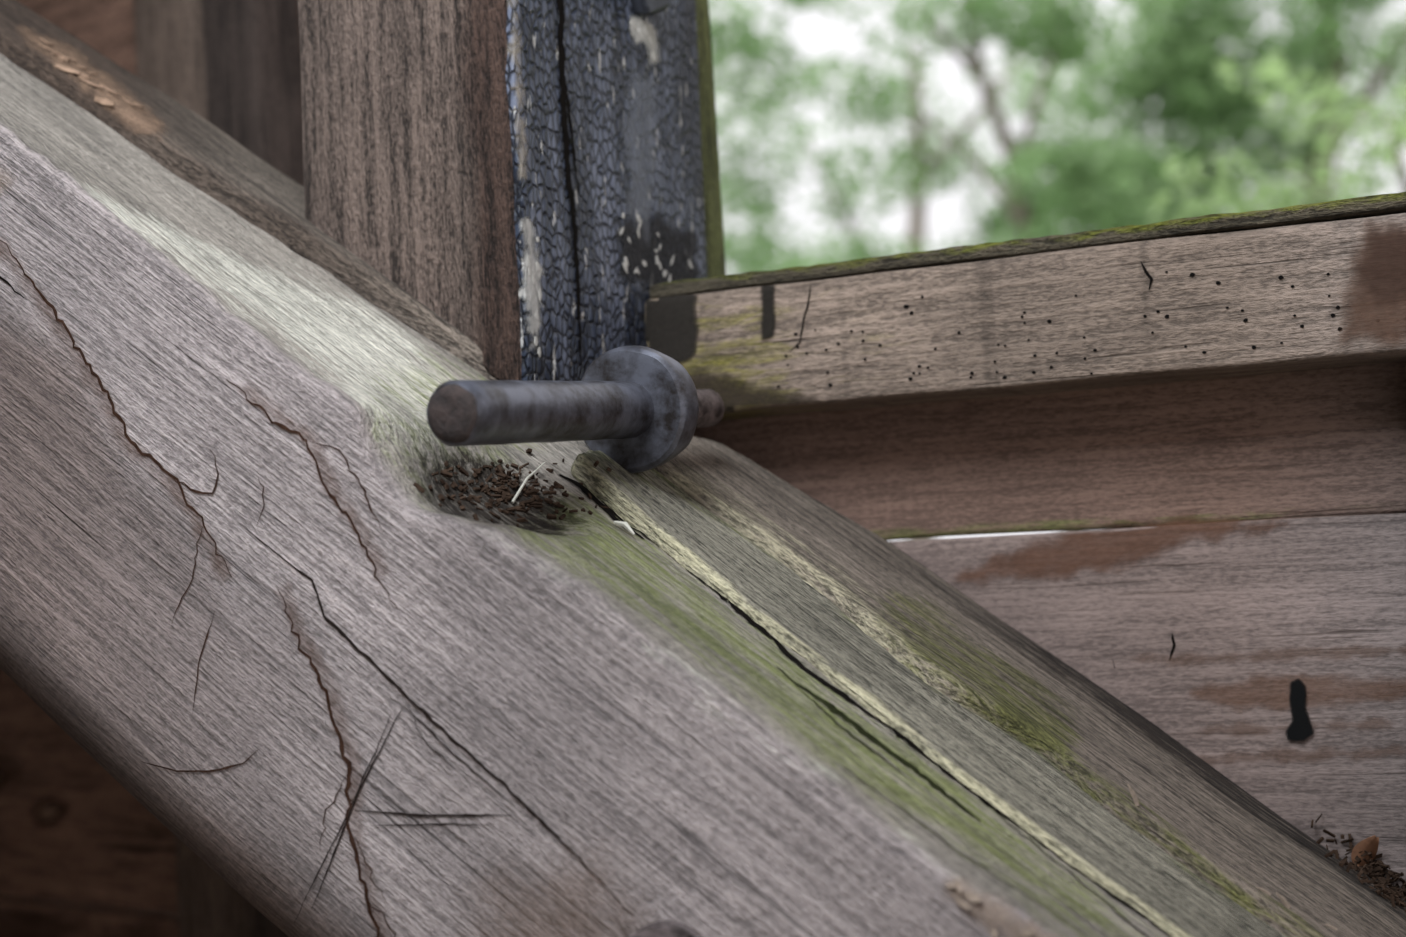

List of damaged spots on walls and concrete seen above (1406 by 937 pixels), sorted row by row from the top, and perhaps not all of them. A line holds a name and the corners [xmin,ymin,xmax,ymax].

peeling [630,17,657,63]
crack [557,0,582,354]
peeling [518,219,542,358]
peeling [618,212,700,285]
leakage [1344,228,1406,342]
crack [0,240,634,937]
leakage [962,520,1234,577]
crack [1168,633,1176,661]